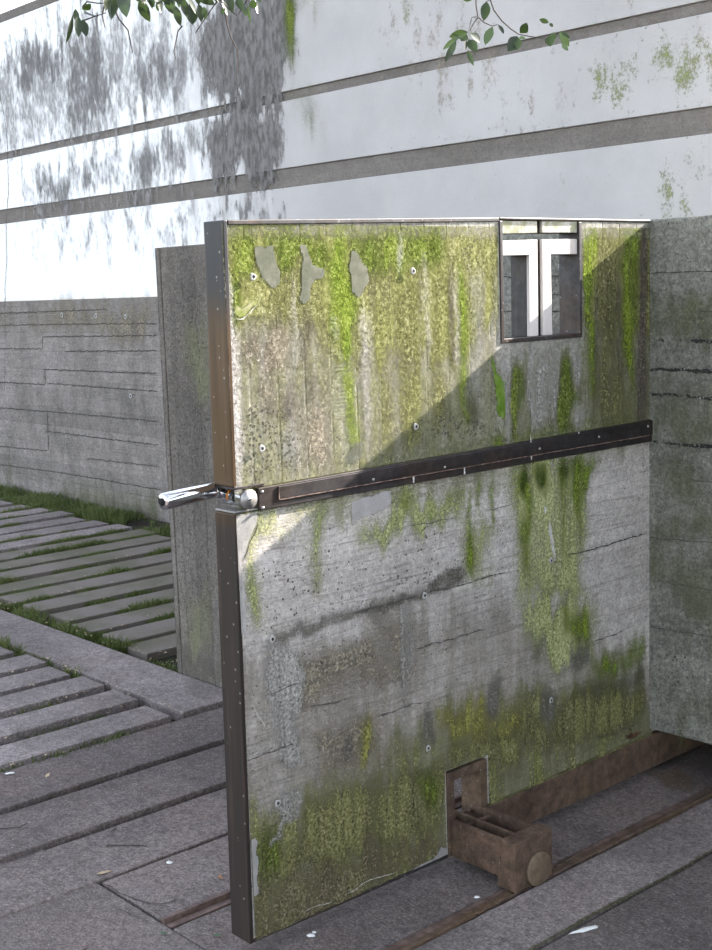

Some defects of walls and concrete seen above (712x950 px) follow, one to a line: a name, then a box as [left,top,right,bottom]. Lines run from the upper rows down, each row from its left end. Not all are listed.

peeling [255,245,280,288]
peeling [300,245,324,304]
peeling [349,251,369,297]
damp [558,458,595,517]
damp [276,567,466,709]
damp [564,603,589,670]
damp [254,836,440,941]